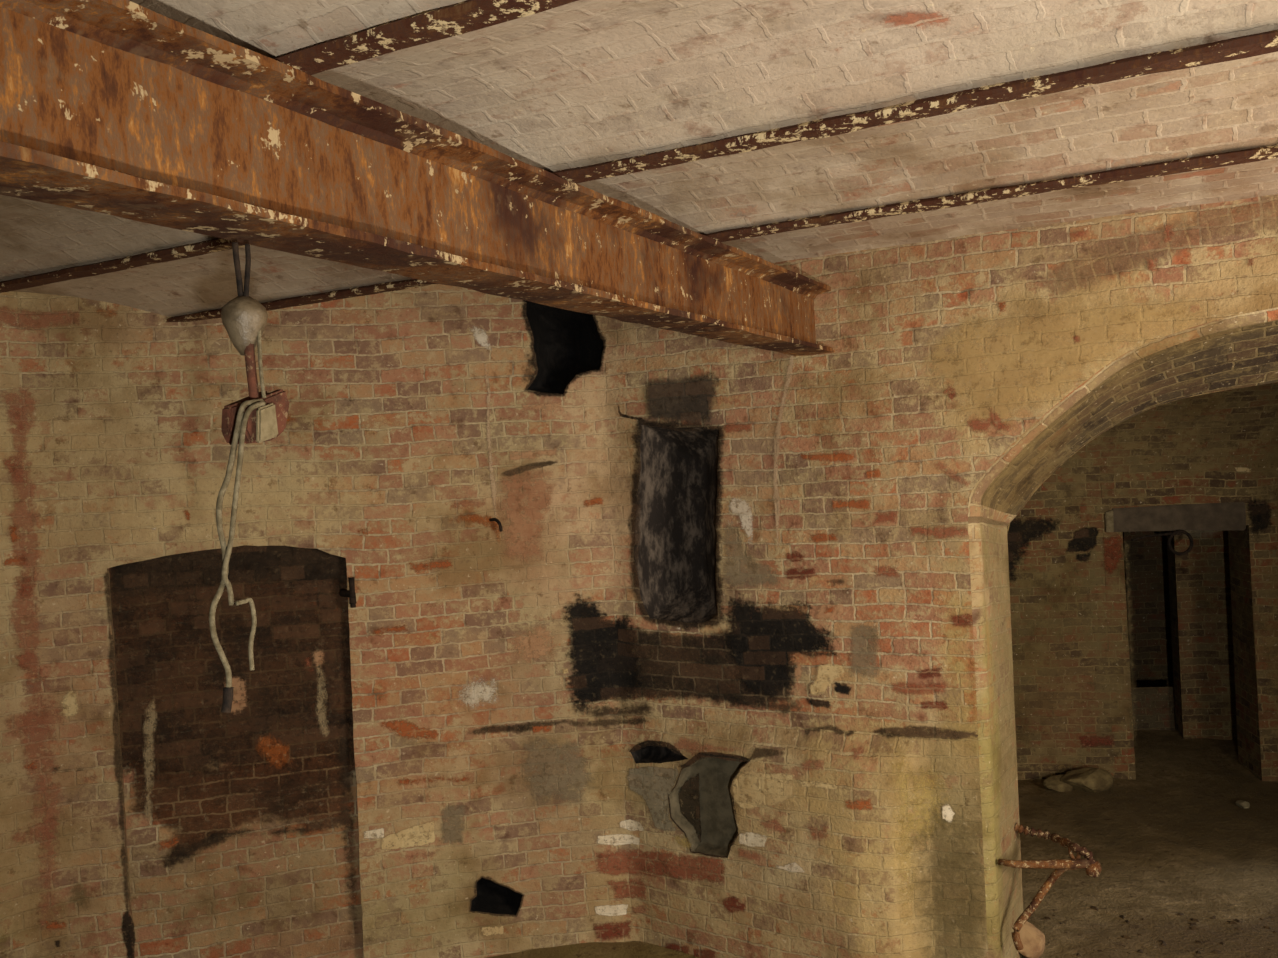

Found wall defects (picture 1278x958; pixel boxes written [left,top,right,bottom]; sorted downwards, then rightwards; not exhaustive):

hole [522,300,606,397]
water stain [143,701,156,825]
water stain [164,830,249,866]
water stain [273,651,356,924]
hole [470,876,524,917]
spalling [593,739,793,940]
spalling [845,799,872,810]